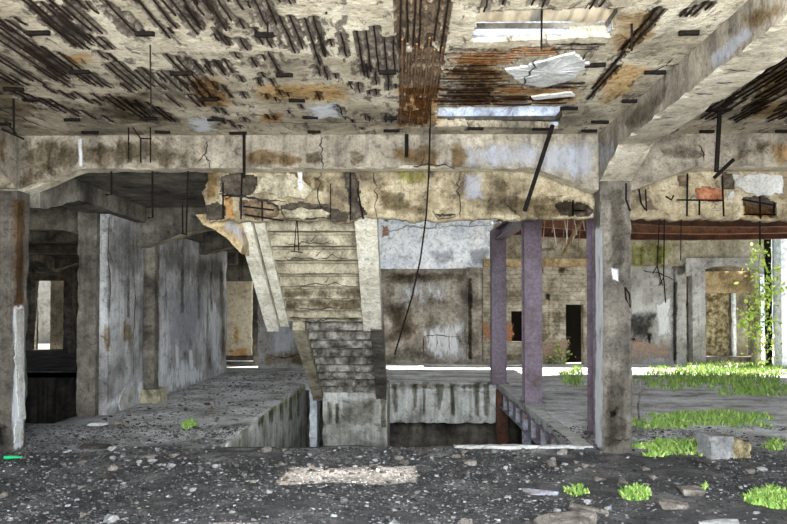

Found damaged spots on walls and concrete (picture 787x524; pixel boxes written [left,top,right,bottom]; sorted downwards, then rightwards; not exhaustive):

spalling [0,0,668,131]
spalling [695,57,787,124]
peeling [196,172,367,256]
peeling [677,172,784,219]
water stain [381,275,473,359]
water stain [631,263,685,361]
water stain [382,382,454,426]